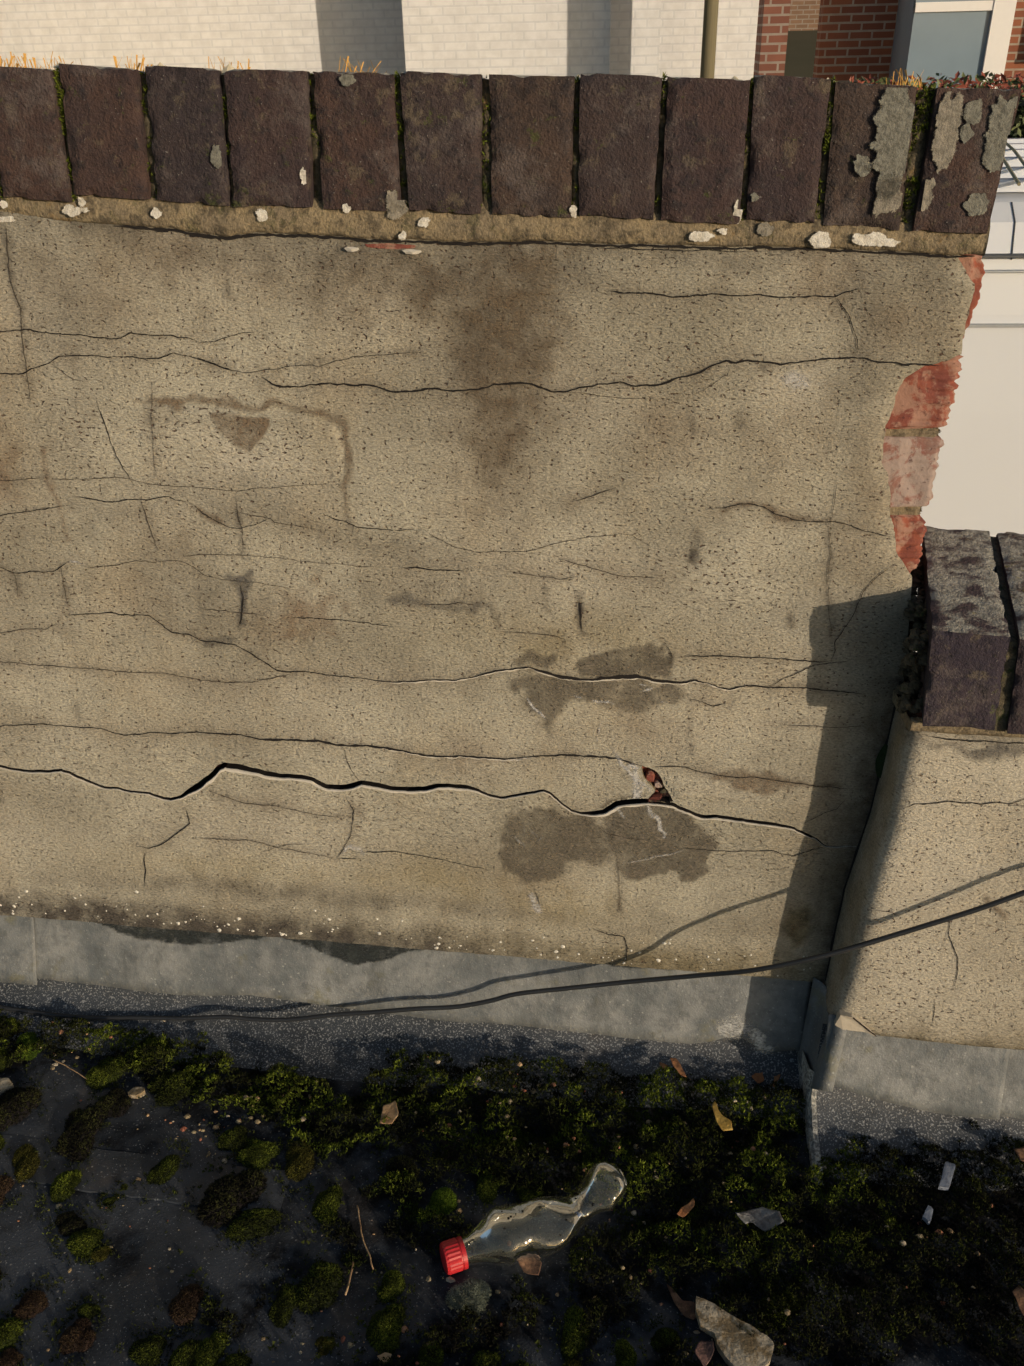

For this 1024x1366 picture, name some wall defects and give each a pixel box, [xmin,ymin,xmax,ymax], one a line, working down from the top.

flaking render [881,355,963,573]
crack [0,225,1024,981]
damp [512,645,680,725]
spalling [642,766,673,803]
damp [500,761,717,911]
damp [102,923,264,945]
damp [285,938,422,965]